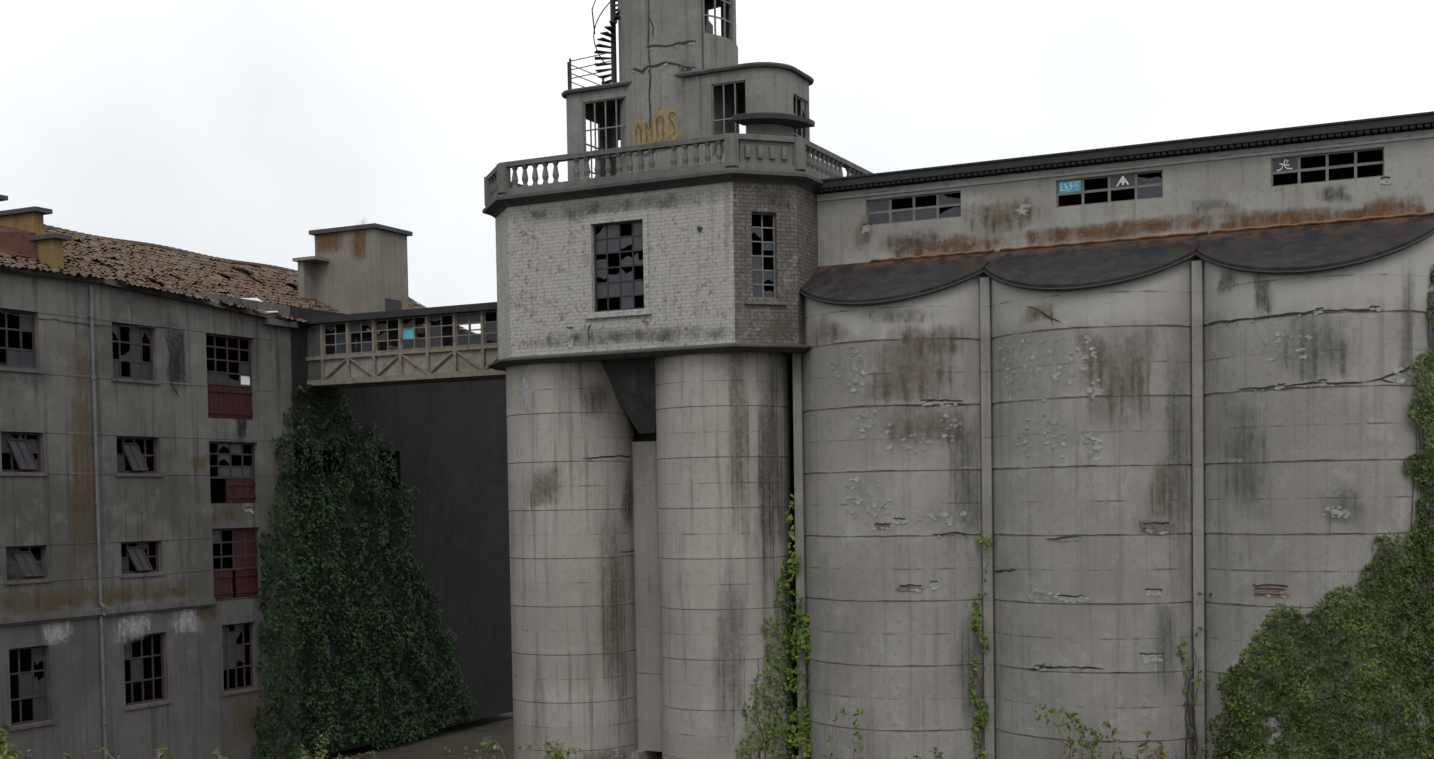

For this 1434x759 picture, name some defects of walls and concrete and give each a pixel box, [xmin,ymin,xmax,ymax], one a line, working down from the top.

crack [632,0,696,126]
rust [1222,201,1424,229]
rust [1028,219,1172,242]
rust [896,235,996,257]
peeling [1075,335,1104,401]
crack [1238,365,1415,392]
peeling [872,510,967,531]
spalling [1253,584,1290,598]